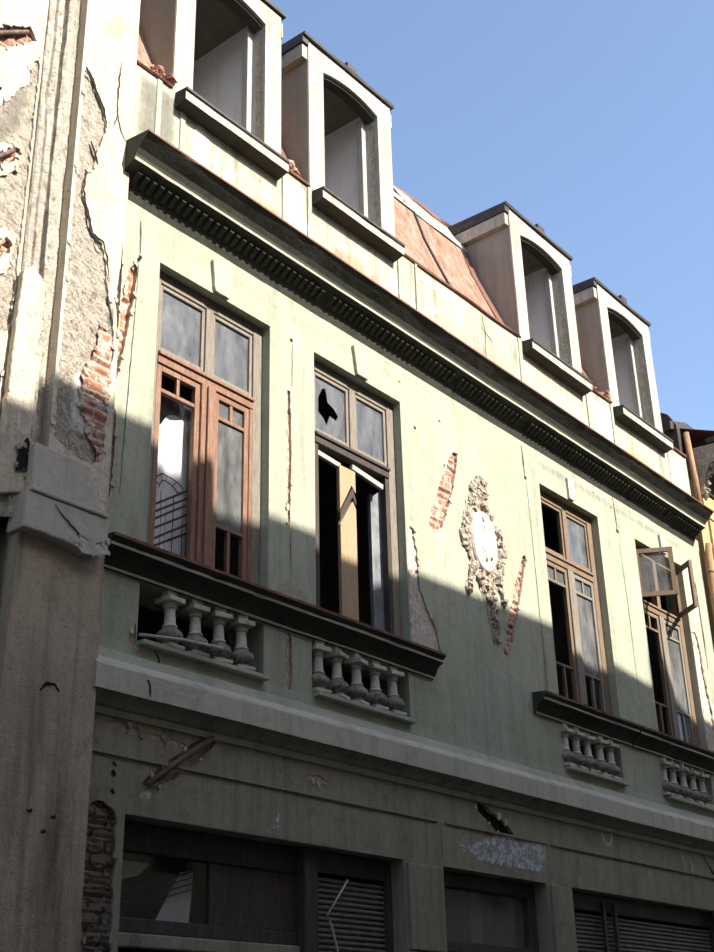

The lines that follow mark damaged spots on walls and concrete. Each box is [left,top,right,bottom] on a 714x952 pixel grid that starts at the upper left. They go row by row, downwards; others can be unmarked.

spalling [0,22,33,50]
spalling [0,57,40,333]
flaking render [77,260,139,488]
flaking render [429,454,455,531]
flaking render [408,528,439,651]
flaking render [464,491,528,655]
flaking render [691,632,714,751]